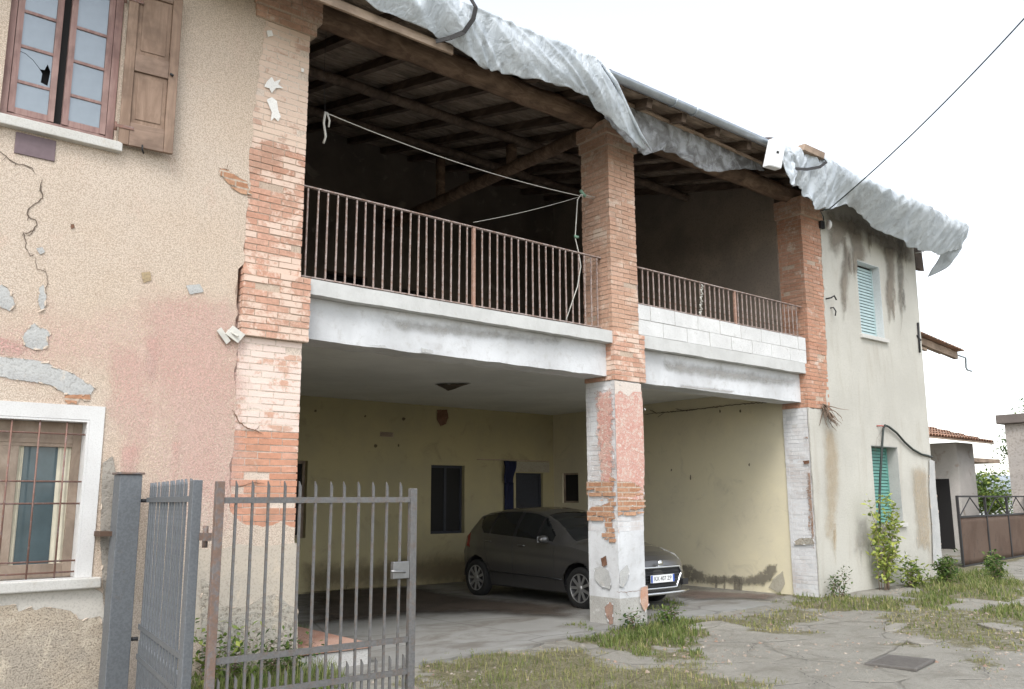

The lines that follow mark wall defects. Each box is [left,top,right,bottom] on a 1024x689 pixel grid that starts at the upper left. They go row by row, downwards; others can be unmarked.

flaking render [219,167,252,195]
crack [0,151,49,294]
leakage [829,214,910,318]
peeling [0,284,96,404]
peeling [586,380,646,543]
peeling [594,556,630,589]
leakage [682,564,776,590]
spalling [605,602,613,625]
spalling [640,585,649,612]